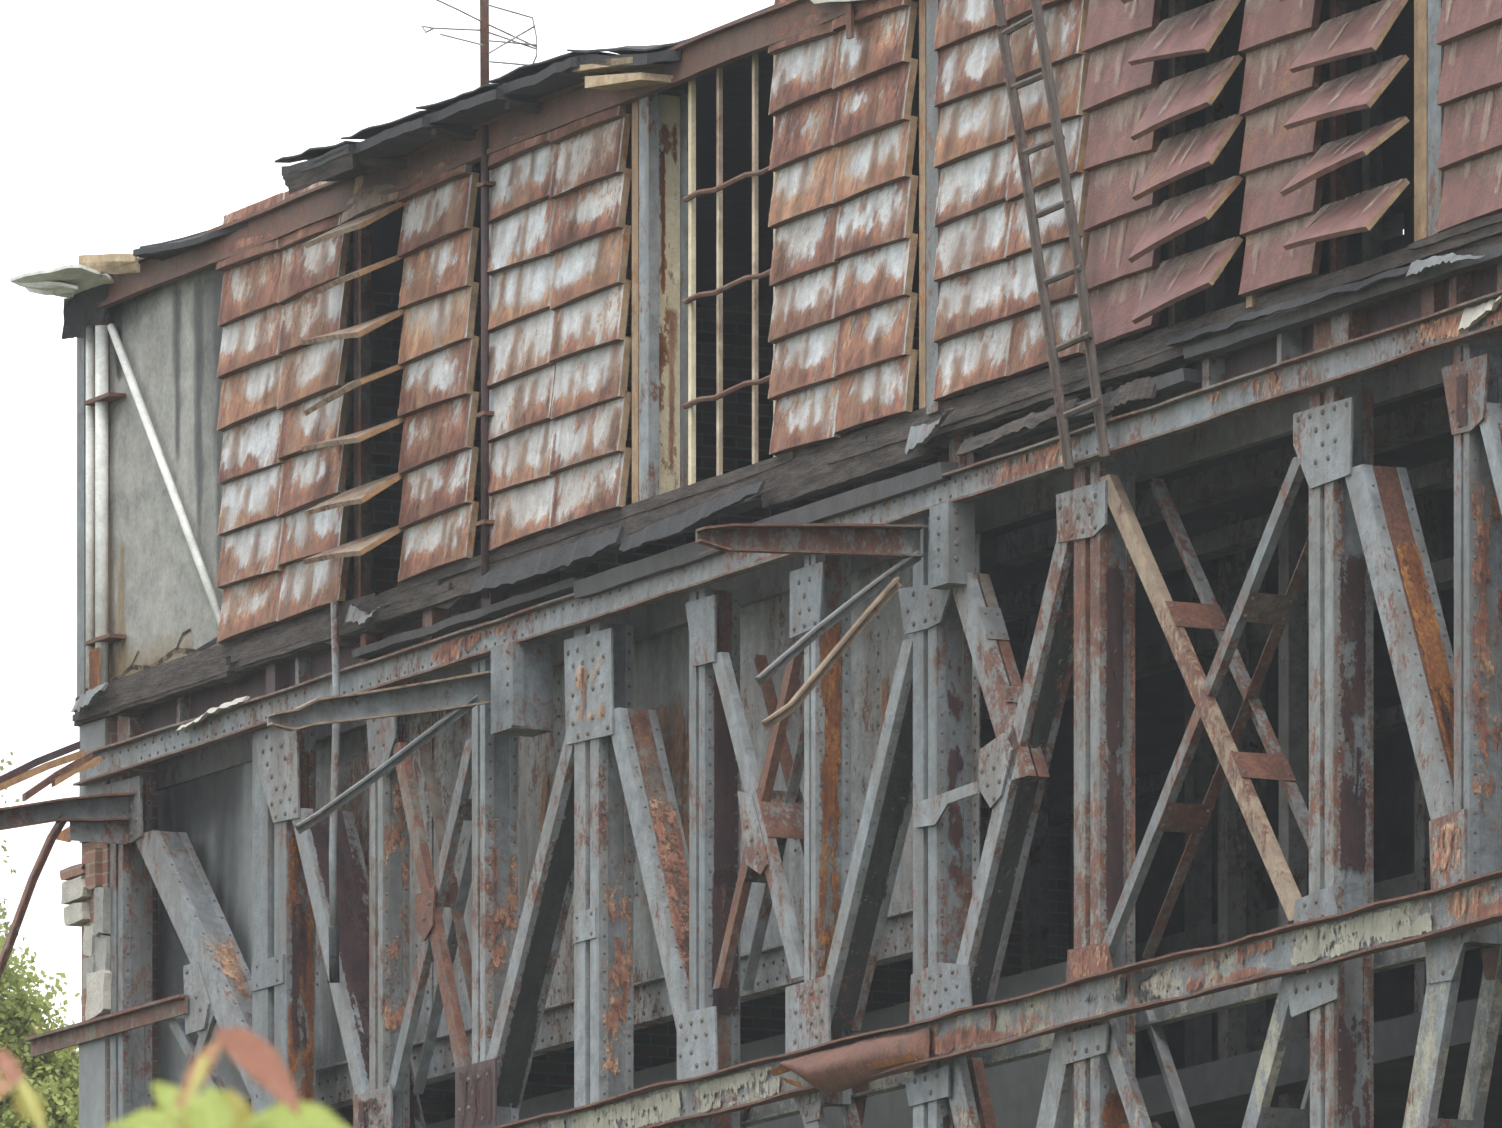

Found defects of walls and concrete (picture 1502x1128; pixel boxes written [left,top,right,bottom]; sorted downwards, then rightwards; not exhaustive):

corrosion [659,123,678,485]
corrosion [288,759,409,1103]
corrosion [358,1097,385,1128]
corrosion [487,819,518,968]
corrosion [602,871,648,1075]
corrosion [650,704,689,984]
corrosion [712,684,739,1016]
corrosion [818,619,842,977]
corrosion [1101,1092,1128,1128]
corrosion [1339,552,1367,874]
corrosion [1396,542,1454,780]
corrosion [1471,480,1502,802]